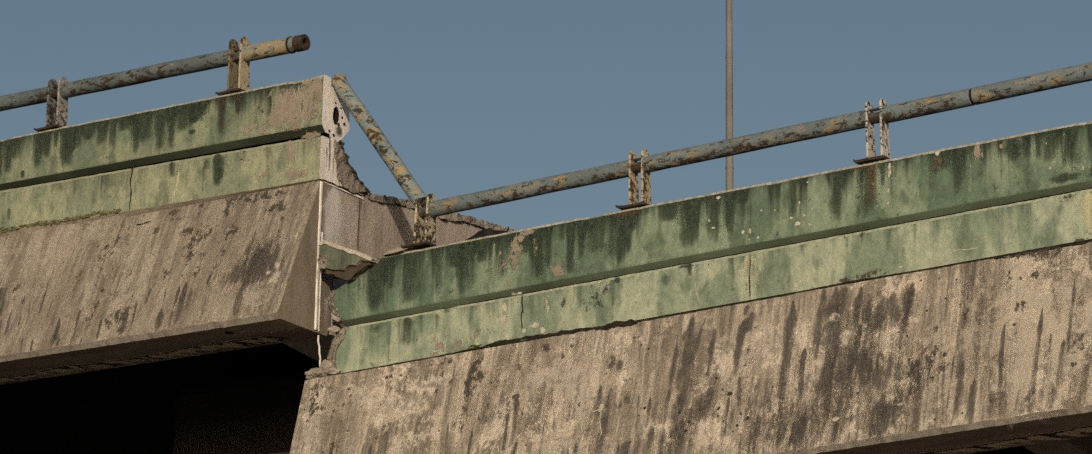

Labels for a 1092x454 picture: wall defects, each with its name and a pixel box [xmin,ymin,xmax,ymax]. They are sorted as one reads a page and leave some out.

damp [34,93,242,164]
damp [156,190,287,328]
peeling [244,77,323,181]
spalling [327,286,385,375]
spalling [334,140,426,208]
spalling [429,213,538,356]
damp [432,209,638,286]
damp [504,353,651,454]
damp [661,188,749,243]
crack [354,190,1092,372]
damp [648,269,975,454]
damp [959,247,1092,412]